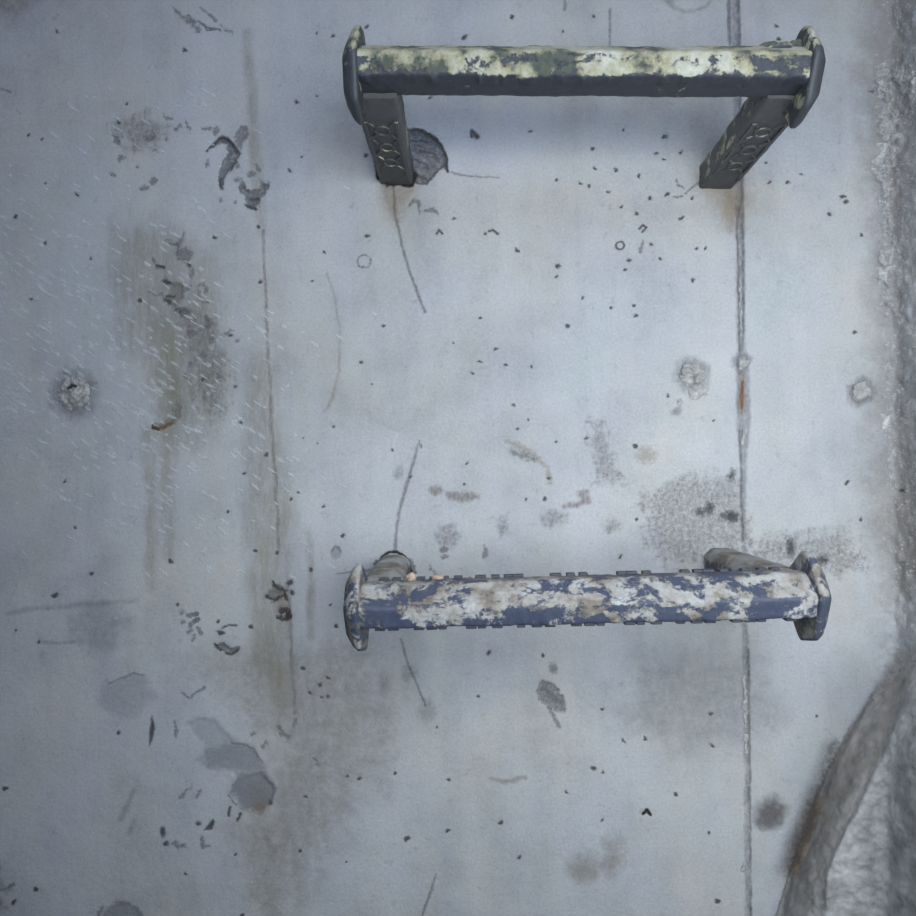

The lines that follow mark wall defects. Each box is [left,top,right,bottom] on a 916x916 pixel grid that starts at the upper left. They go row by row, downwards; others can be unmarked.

spalling [408,128,449,185]